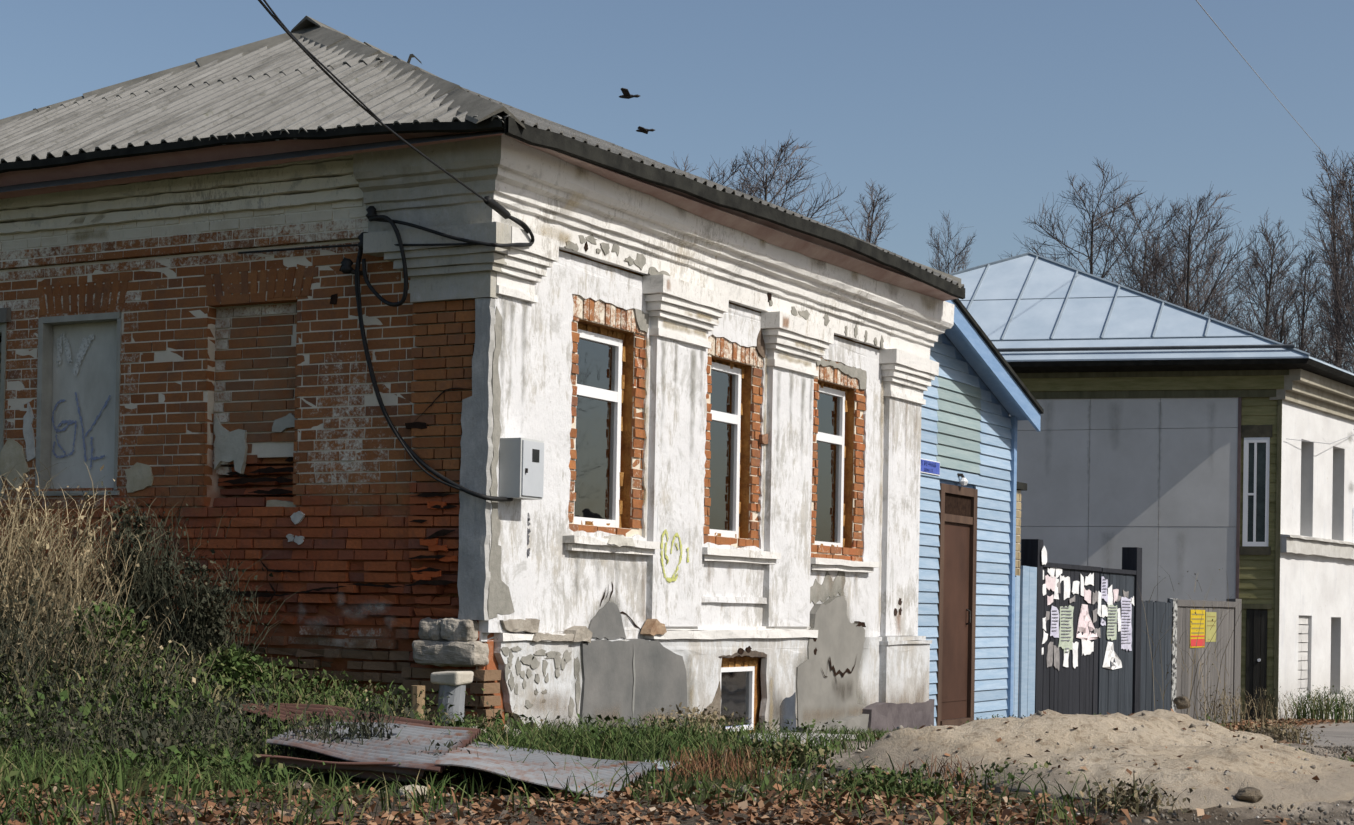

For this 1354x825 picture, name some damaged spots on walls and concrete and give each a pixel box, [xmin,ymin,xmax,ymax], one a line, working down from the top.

peeling [564,234,670,276]
peeling [0,402,36,490]
peeling [124,462,154,493]
peeling [214,413,305,545]
spalling [408,492,459,580]
peeling [487,306,592,718]
peeling [810,571,846,605]